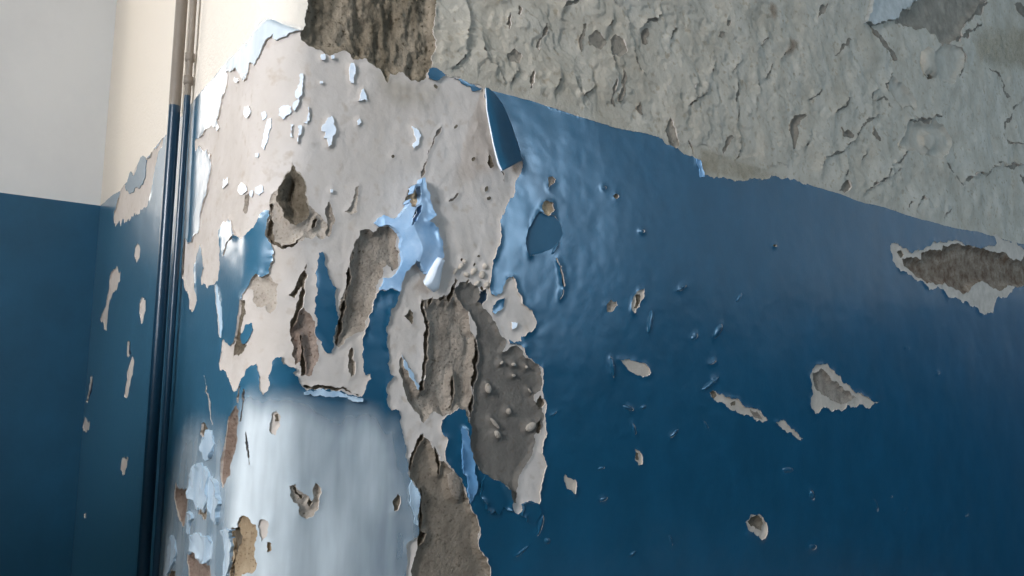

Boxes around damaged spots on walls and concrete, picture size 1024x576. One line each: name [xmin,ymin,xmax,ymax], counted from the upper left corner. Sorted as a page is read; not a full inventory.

crack [647,15,677,39]
crack [690,37,786,118]
crack [806,26,942,175]
crack [956,3,986,76]
crack [947,68,1020,184]
peeling [114,140,163,225]
peeling [102,267,120,330]
peeling [183,0,547,576]
spalling [890,234,1024,314]
peeling [709,391,802,440]
peeling [810,363,877,413]
spalling [164,406,272,576]